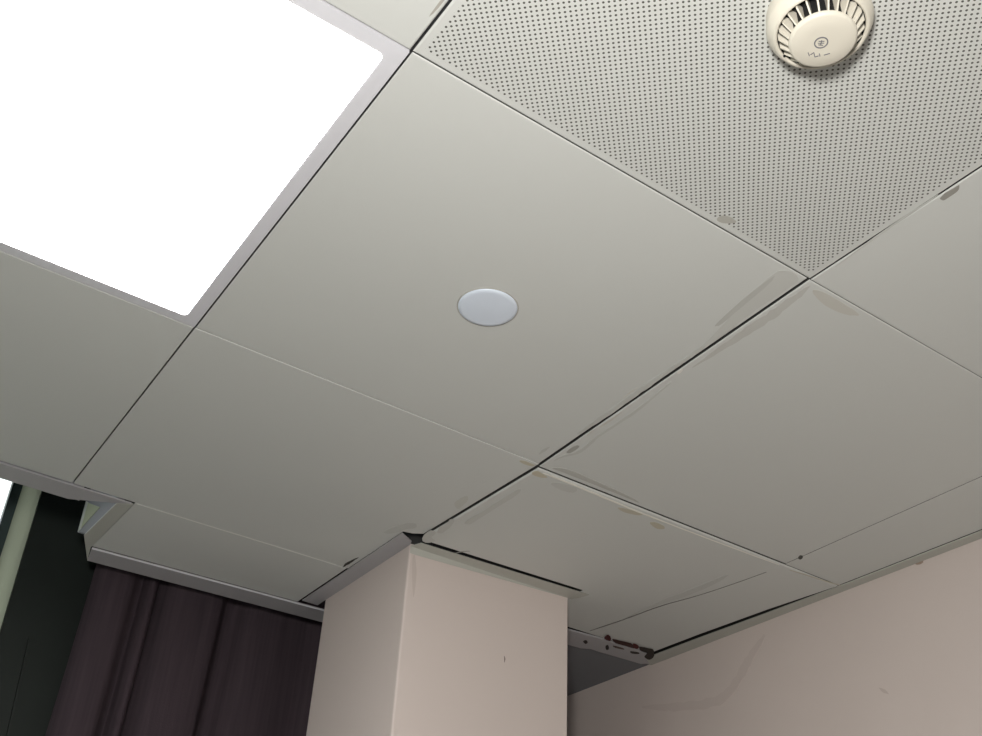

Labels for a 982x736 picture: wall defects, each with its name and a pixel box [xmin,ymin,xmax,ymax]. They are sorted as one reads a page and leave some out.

corrosion [604,635,639,649]